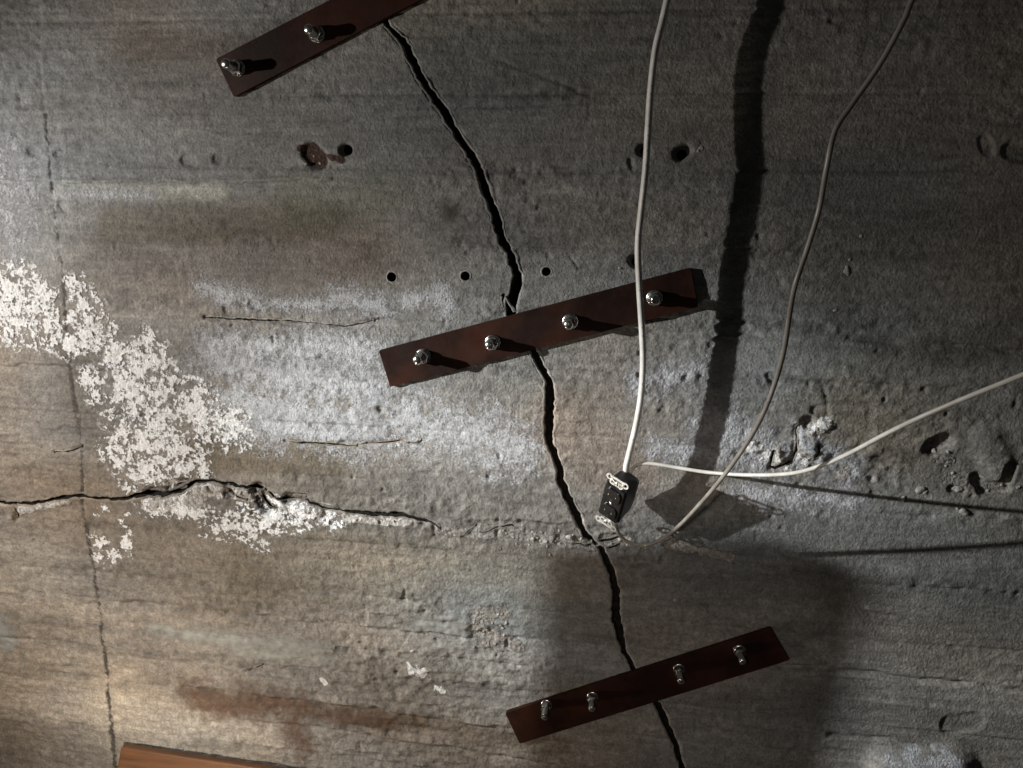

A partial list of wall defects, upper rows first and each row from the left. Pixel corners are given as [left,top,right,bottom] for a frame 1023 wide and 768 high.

crack [380,17,526,316]
leakage [0,125,551,566]
crack [204,316,378,328]
crack [285,438,422,448]
spalling [774,445,786,471]
spalling [805,417,832,438]
spalling [921,432,1021,495]
spalling [17,500,72,515]
crack [0,477,517,537]
spalling [140,478,413,527]
crack [528,348,638,671]
crack [651,700,688,768]